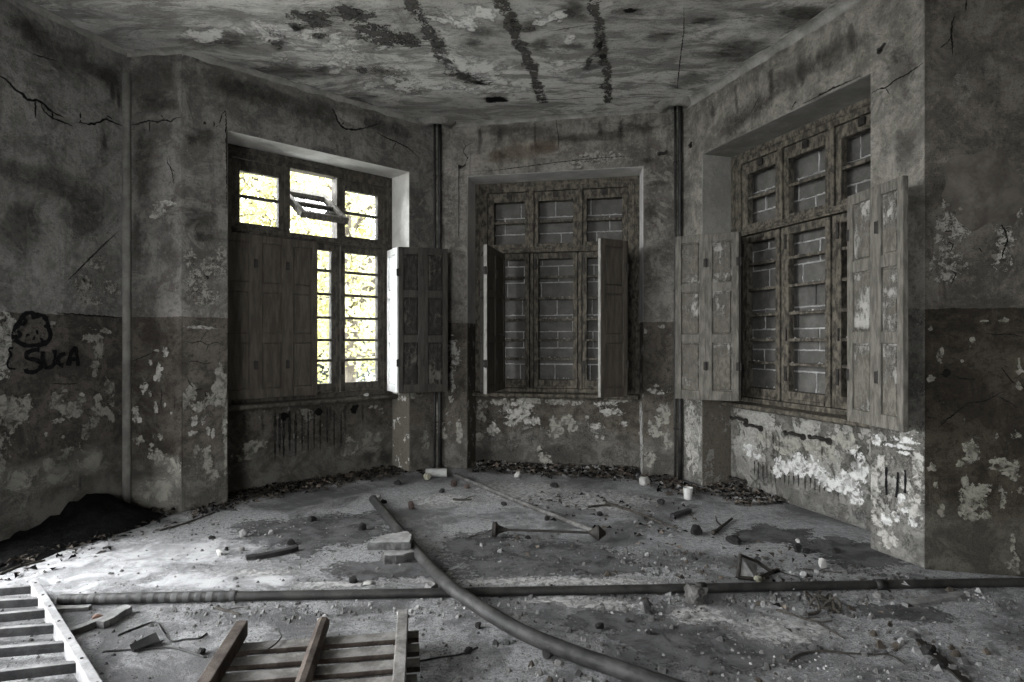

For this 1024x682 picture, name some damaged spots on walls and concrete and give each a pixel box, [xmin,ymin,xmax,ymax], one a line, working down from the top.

peeling [264,4,482,85]
crack [742,0,967,133]
crack [0,68,227,204]
peeling [0,301,18,380]
peeling [0,393,34,441]
peeling [44,327,116,439]
peeling [131,347,268,482]
damp [278,410,382,458]
peeling [421,334,701,475]
damp [758,462,839,495]
peeling [742,430,938,550]
peeling [955,438,1022,521]